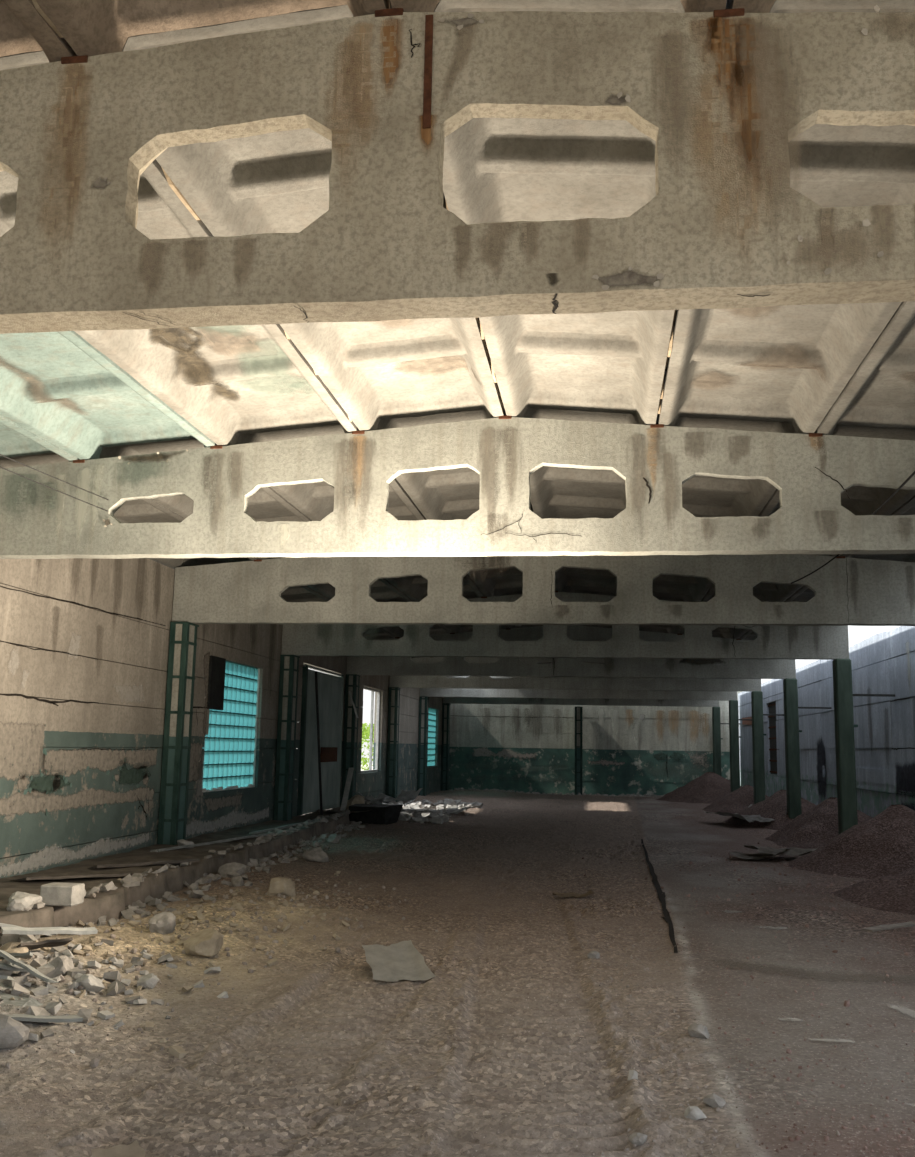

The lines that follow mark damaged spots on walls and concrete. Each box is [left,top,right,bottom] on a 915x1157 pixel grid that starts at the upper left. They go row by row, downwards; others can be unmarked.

rust [382,19,400,87]
rust [703,17,761,185]
crack [551,294,559,314]
damp [151,327,258,400]
crack [643,477,652,503]
crack [0,694,99,706]
peeling [0,722,159,816]